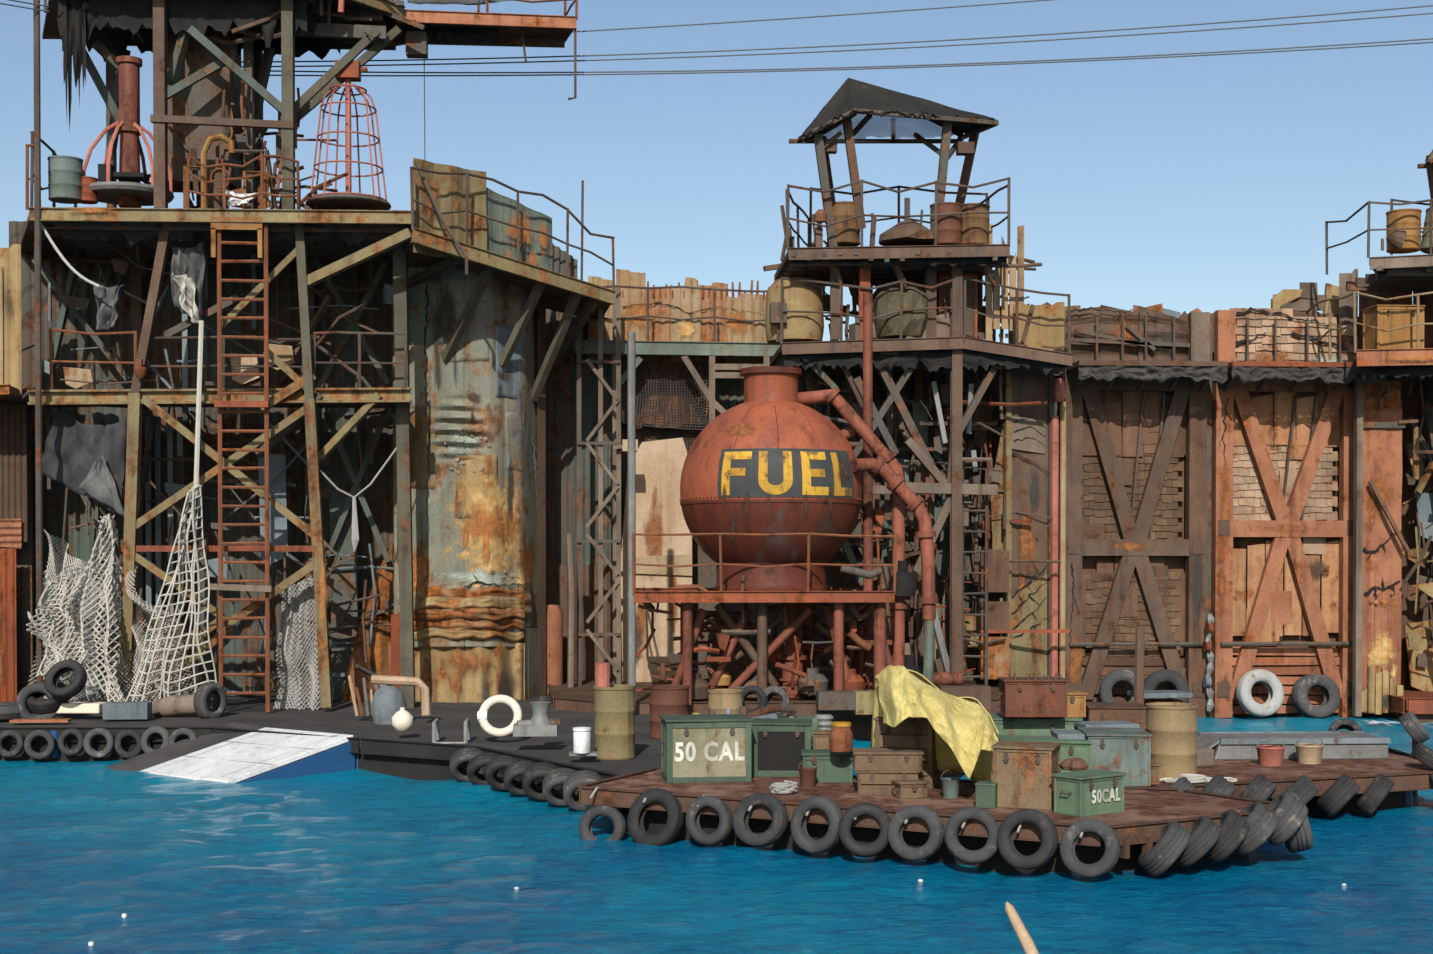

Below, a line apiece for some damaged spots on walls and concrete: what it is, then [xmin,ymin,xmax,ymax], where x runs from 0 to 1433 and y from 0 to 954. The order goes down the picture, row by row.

rust [506,212,547,266]
rust [829,458,849,516]
rust [645,490,662,556]
rust [413,474,535,700]